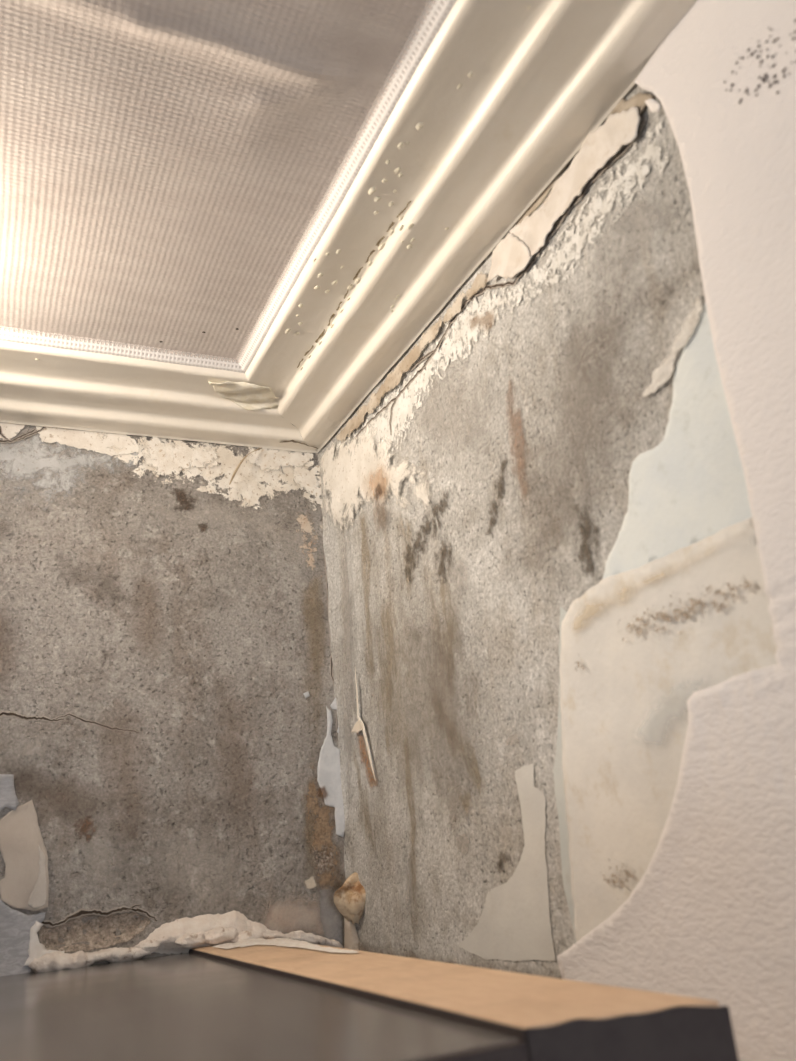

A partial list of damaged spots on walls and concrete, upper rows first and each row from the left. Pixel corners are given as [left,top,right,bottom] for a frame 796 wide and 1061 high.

water stain [724,19,796,104]
peeling [336,92,661,442]
crack [0,426,46,443]
peeling [0,412,323,513]
water stain [485,460,506,534]
water stain [404,493,452,584]
water stain [579,508,598,573]
water stain [623,577,761,642]
crack [0,711,139,733]
peeling [337,668,376,785]
spalling [38,912,150,953]
crack [41,904,157,928]